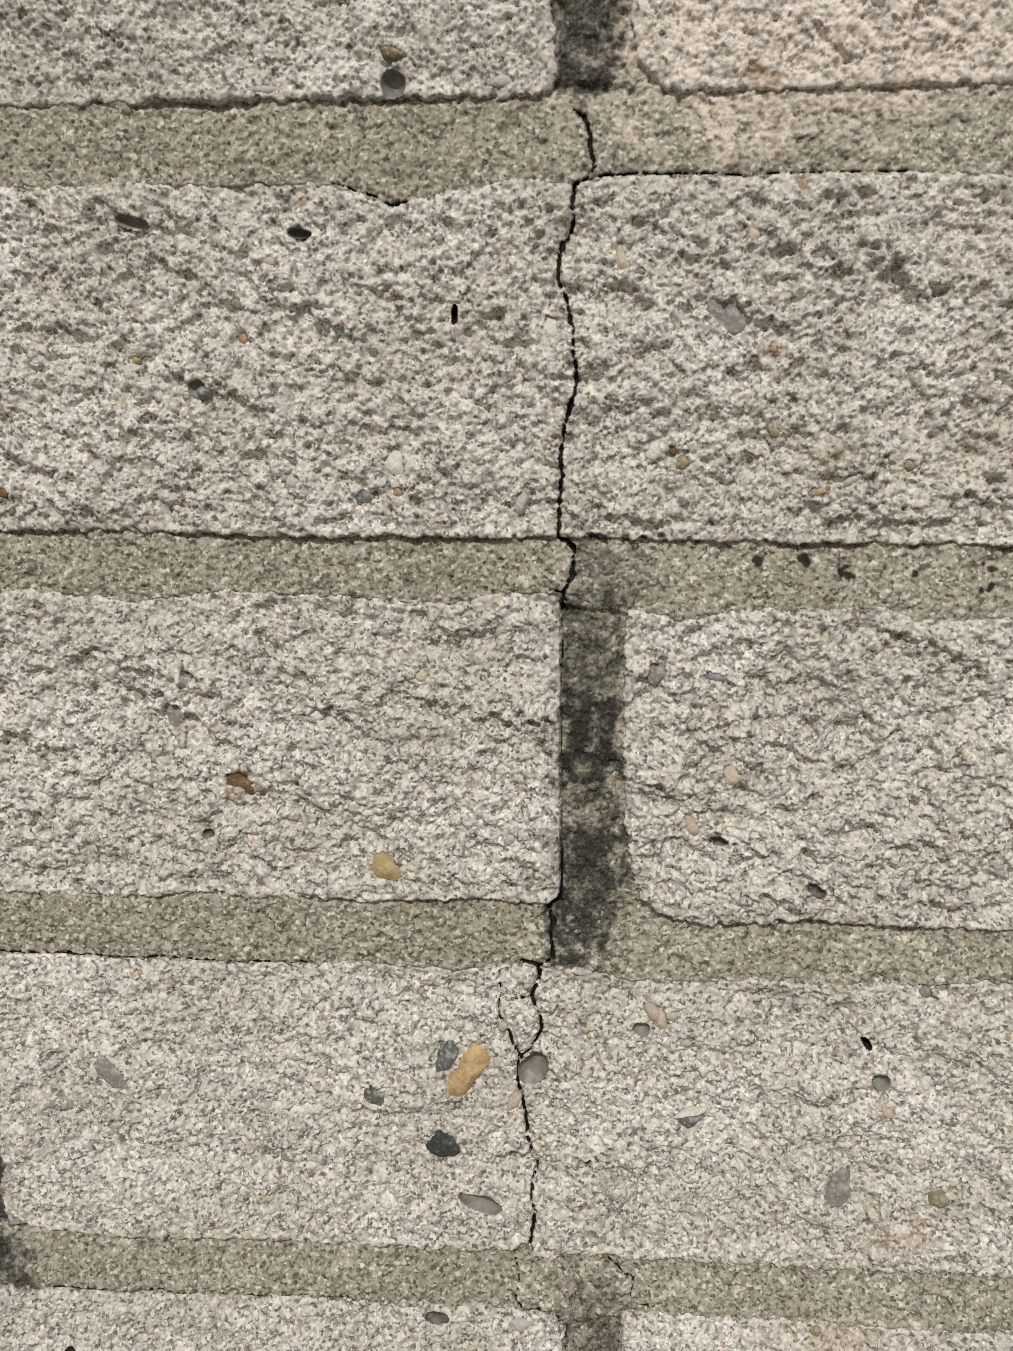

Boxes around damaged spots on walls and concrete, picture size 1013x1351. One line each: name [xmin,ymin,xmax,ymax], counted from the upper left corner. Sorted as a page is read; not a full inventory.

leakage [550,0,625,94]
crack [556,110,908,754]
leakage [552,592,622,797]
leakage [544,814,628,971]
crack [498,821,567,1350]
leakage [0,1157,8,1218]
leakage [0,1235,35,1288]
crack [607,1255,654,1343]